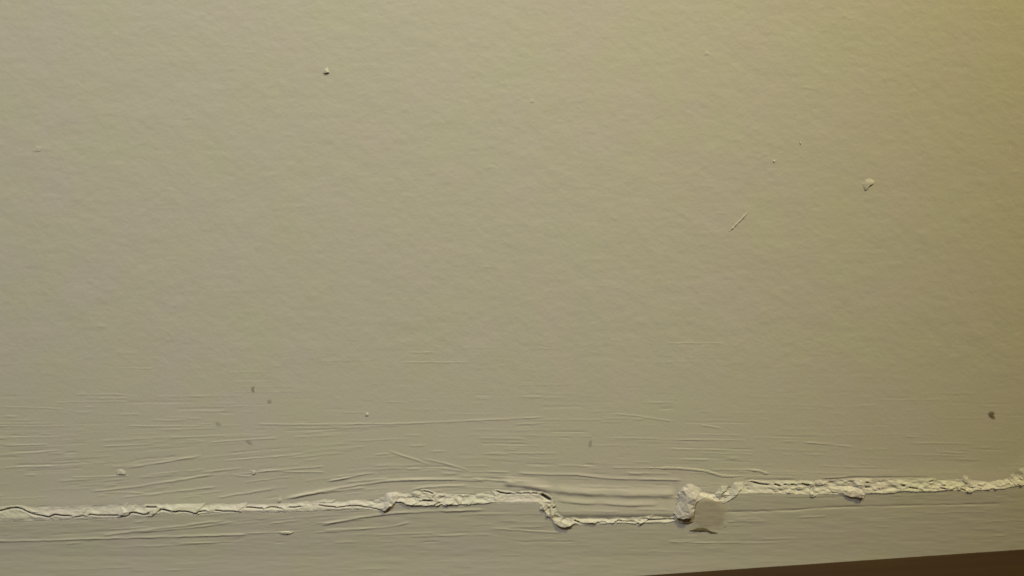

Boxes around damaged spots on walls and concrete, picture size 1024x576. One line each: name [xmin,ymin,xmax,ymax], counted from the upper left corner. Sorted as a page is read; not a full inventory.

peeling [961,467,1024,492]
peeling [148,502,206,516]
crack [0,491,442,517]
peeling [404,491,476,506]